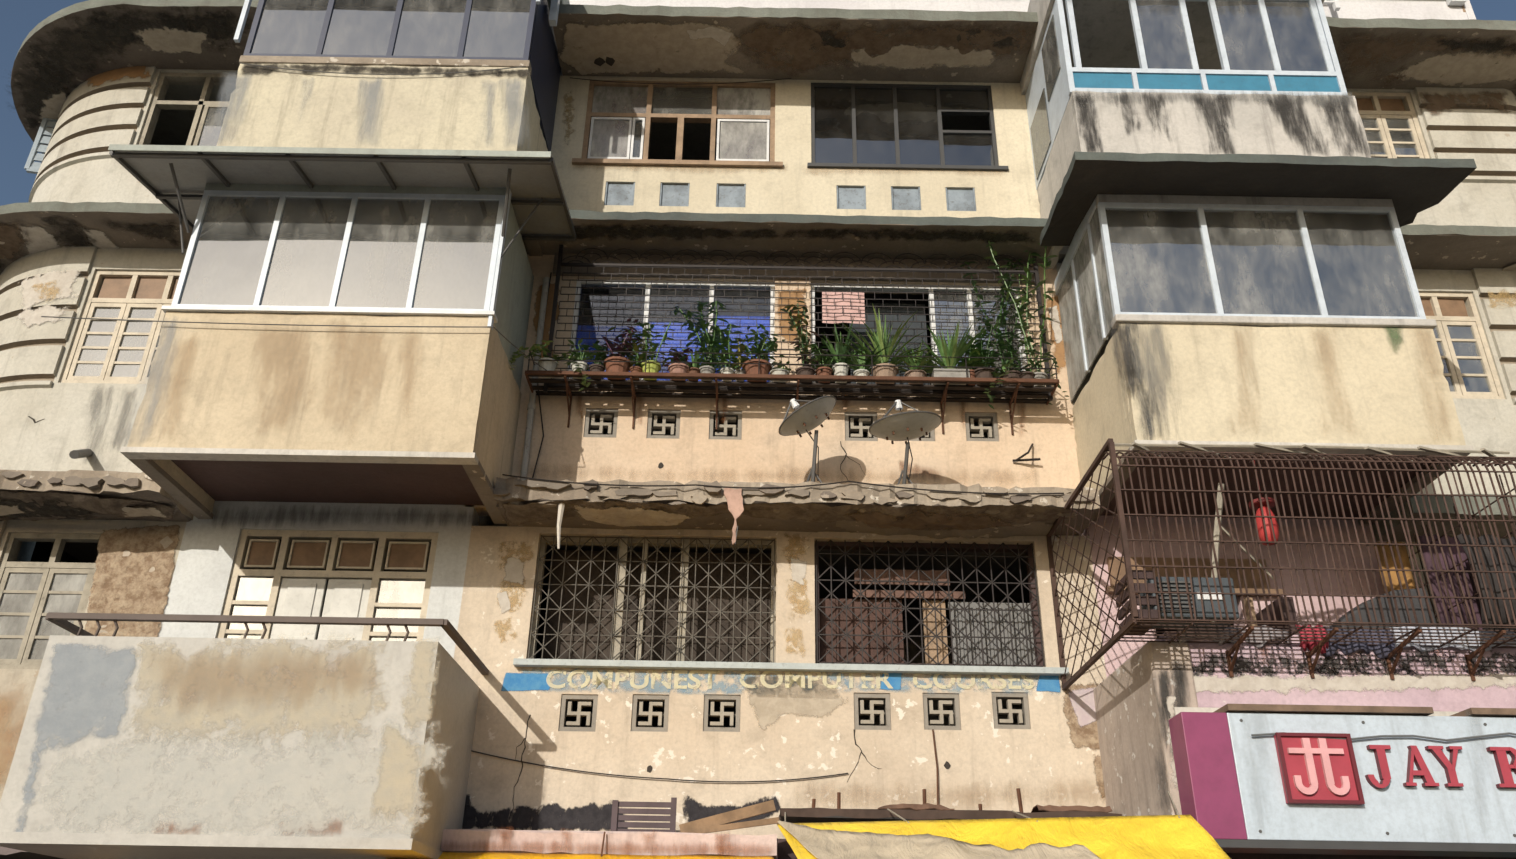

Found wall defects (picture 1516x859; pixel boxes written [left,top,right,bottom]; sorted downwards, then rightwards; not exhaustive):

peeling [88,26,207,87]
water stain [242,63,530,77]
flaking render [559,20,1033,76]
peeling [1392,50,1516,86]
water stain [1076,95,1103,152]
water stain [1114,92,1172,133]
water stain [1190,93,1235,154]
peeling [0,226,61,254]
peeling [19,269,79,327]
water stain [1386,327,1401,347]
water stain [1112,323,1166,436]
spalling [480,479,1094,530]